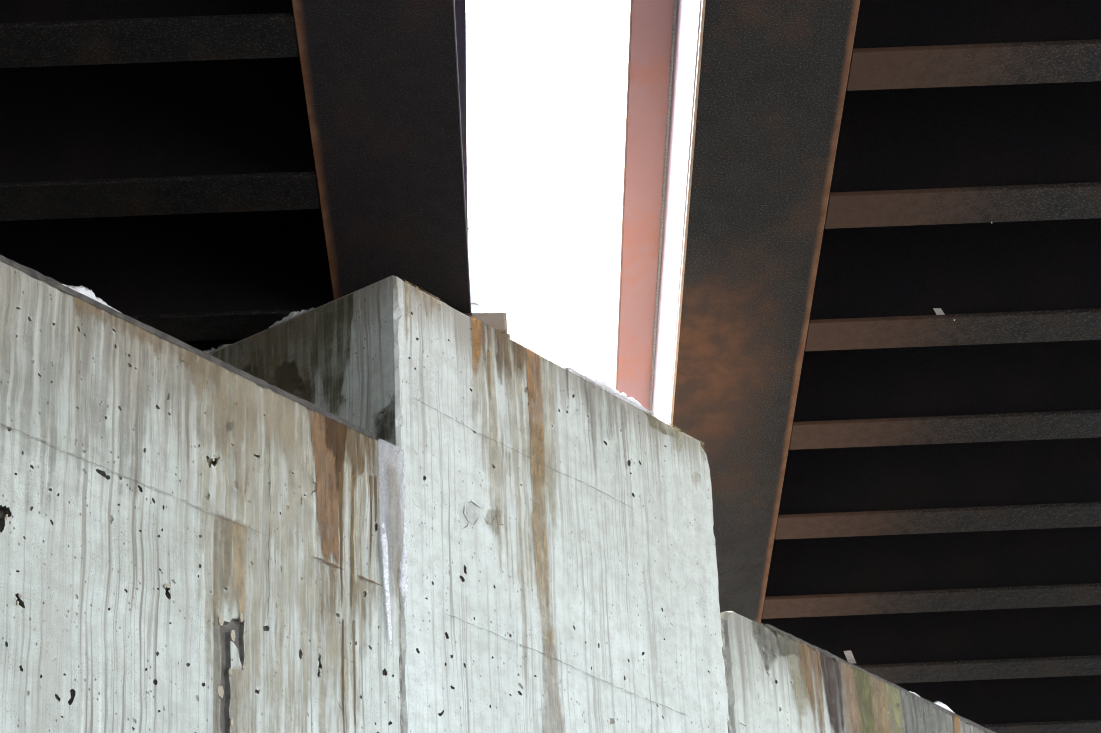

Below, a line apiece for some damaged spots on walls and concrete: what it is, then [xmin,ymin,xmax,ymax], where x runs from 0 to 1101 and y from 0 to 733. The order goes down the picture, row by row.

peeling [217,613,246,733]
water stain [185,310,352,733]
corrosion [308,409,377,733]
corrosion [472,317,549,600]
corrosion [543,627,564,733]